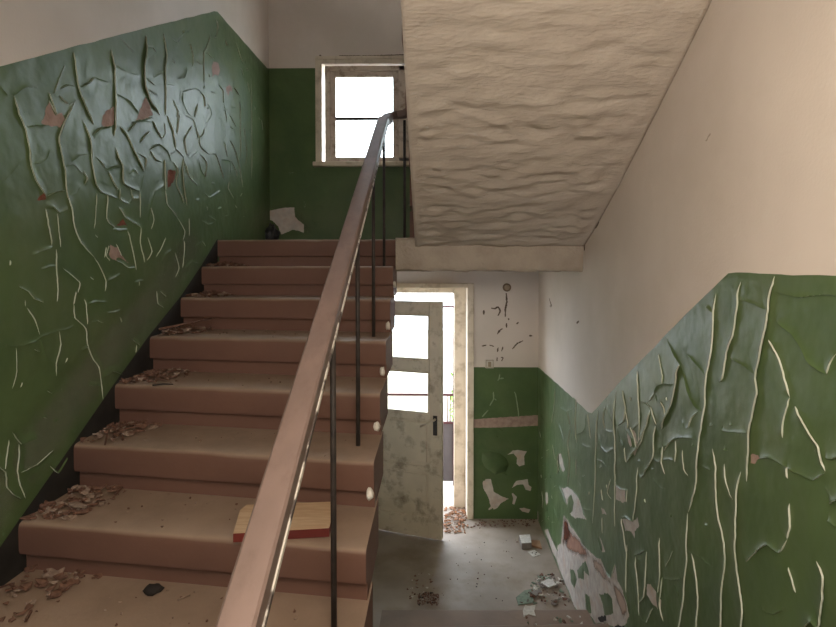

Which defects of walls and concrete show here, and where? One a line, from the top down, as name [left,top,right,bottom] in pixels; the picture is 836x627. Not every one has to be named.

peeling [102,107,114,127]
peeling [136,98,154,122]
peeling [106,243,128,263]
peeling [474,450,531,513]
peeling [615,480,639,538]
peeling [545,485,631,627]
peeling [647,579,662,609]